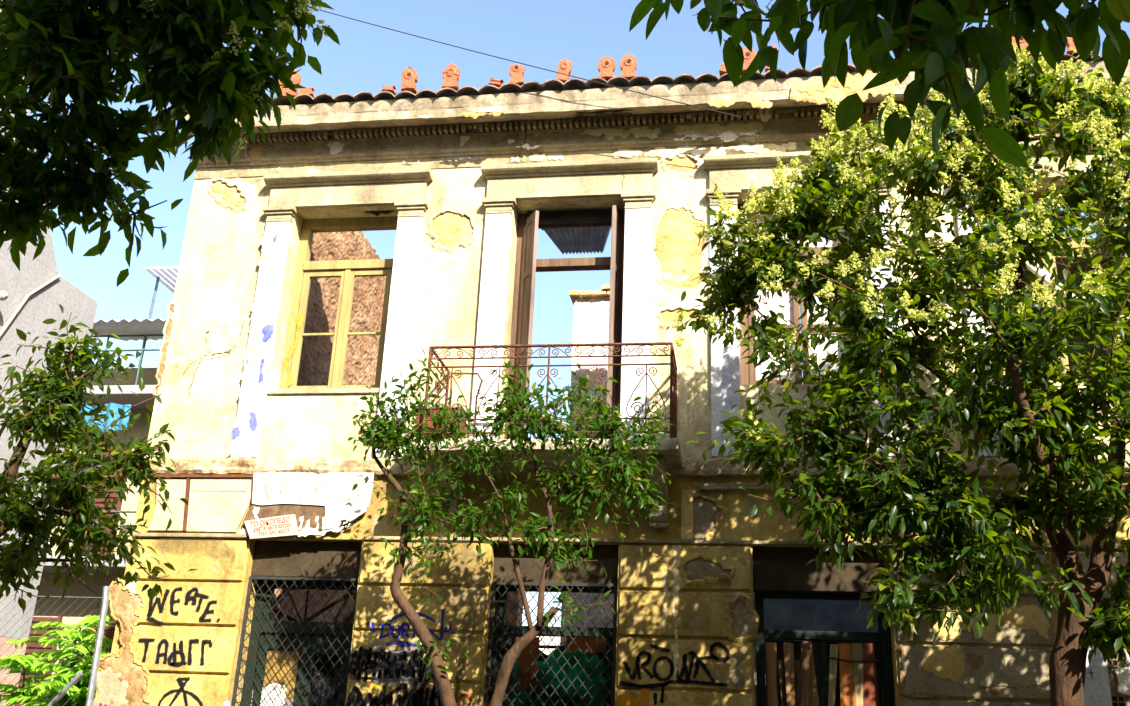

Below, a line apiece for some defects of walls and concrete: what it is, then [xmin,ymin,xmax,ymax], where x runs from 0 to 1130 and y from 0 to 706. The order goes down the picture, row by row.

spalling [790,68,898,105]
peeling [579,97,796,179]
spalling [206,177,257,213]
spalling [425,208,478,255]
spalling [651,203,710,330]
crack [183,318,244,400]
peeling [227,304,275,458]
spalling [676,493,760,689]
spalling [92,578,153,706]
peeling [251,683,287,706]
peeling [895,604,1050,706]